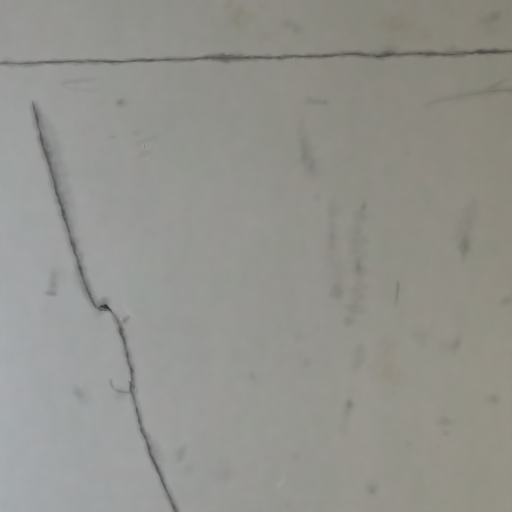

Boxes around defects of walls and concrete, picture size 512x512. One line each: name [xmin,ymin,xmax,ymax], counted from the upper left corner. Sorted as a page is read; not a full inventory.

crack [0,50,512,65]
crack [32,101,178,512]